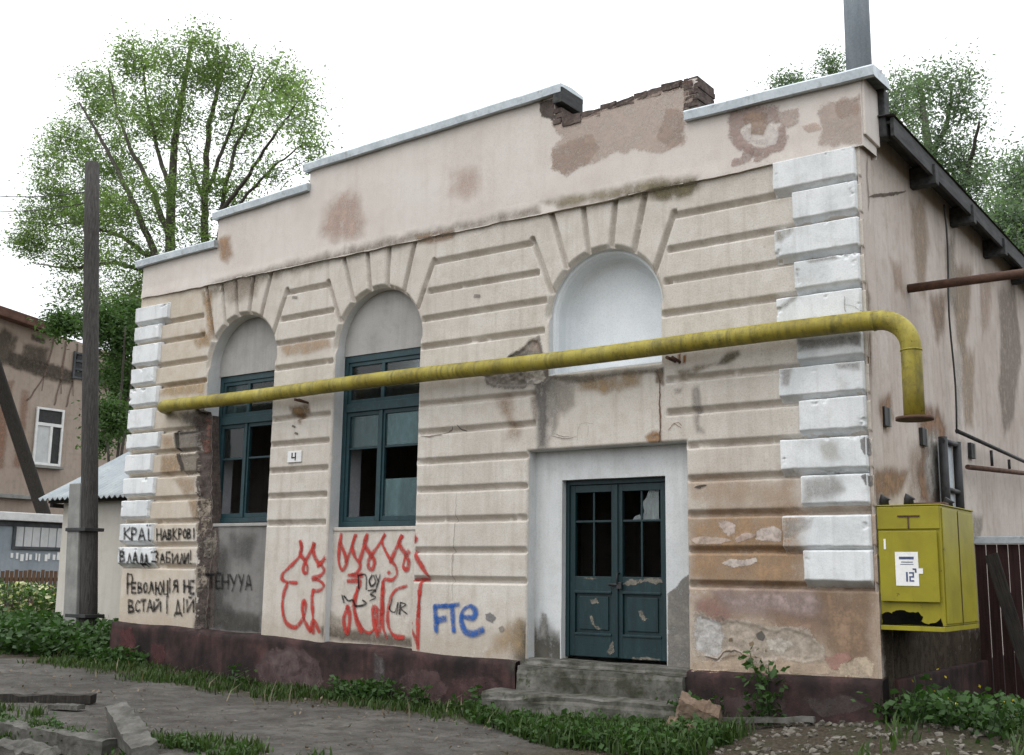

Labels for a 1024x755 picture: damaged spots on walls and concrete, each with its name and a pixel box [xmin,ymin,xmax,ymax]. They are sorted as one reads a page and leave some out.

peeling [539,80,693,174]
peeling [729,106,799,166]
damp [548,180,696,206]
crack [867,160,905,210]
damp [204,228,453,300]
spalling [507,336,542,357]
damp [912,201,1021,429]
damp [532,377,572,446]
crack [652,371,682,441]
spalling [173,412,219,629]
peeling [691,521,782,544]
spalling [691,612,874,677]